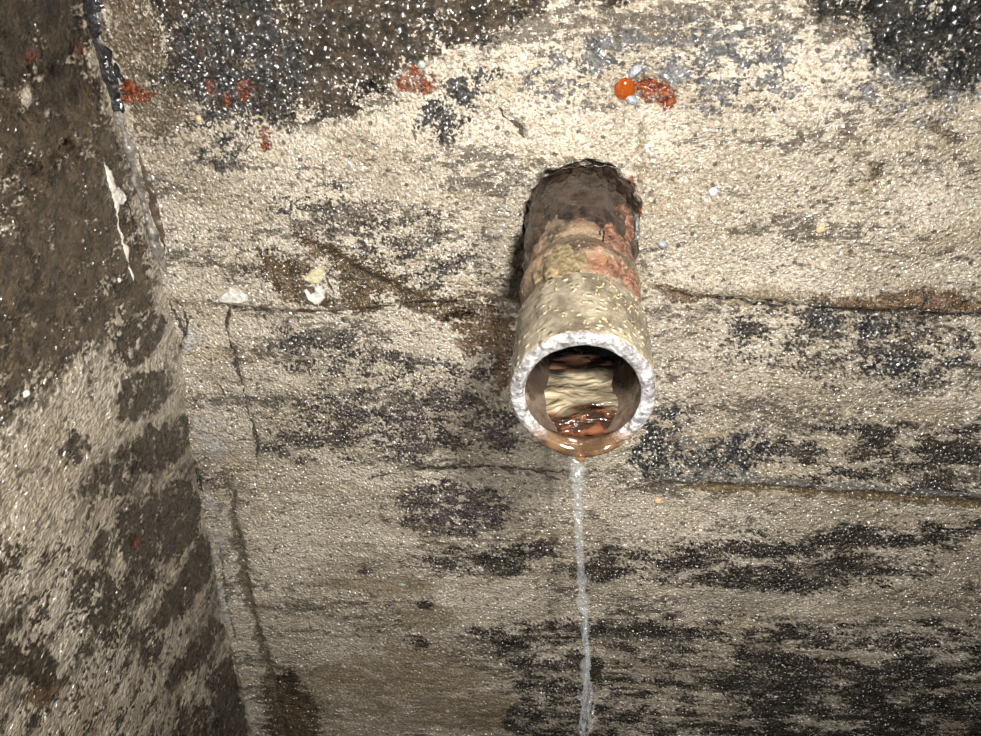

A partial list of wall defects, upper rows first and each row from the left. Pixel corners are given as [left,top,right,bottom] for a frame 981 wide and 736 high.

corrosion [120,80,157,105]
corrosion [396,64,439,95]
corrosion [633,77,678,111]
water stain [522,4,805,116]
water stain [801,0,981,138]
water stain [0,0,549,427]
corrosion [522,162,643,273]
crack [648,284,981,316]
water stain [801,286,981,342]
crack [167,232,508,493]
water stain [860,353,924,388]
water stain [710,648,842,736]